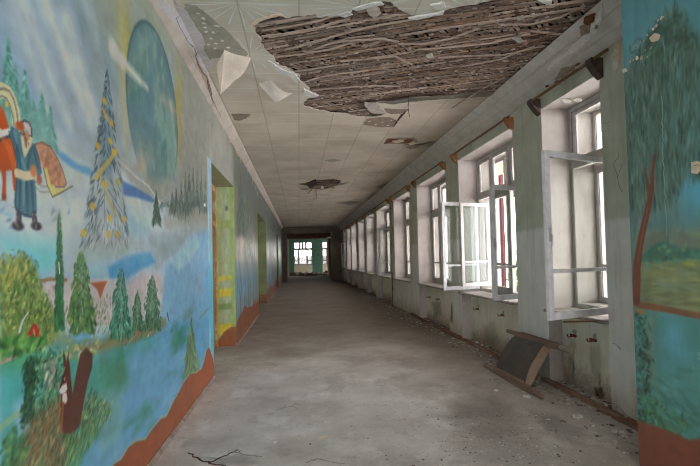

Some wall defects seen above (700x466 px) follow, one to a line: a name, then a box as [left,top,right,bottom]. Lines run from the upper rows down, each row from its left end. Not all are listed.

crack [176,18,221,116]
peeling [155,0,248,75]
spalling [545,3,603,87]
peeling [612,16,664,73]
peeling [364,102,407,127]
peeling [691,161,700,174]
crack [188,449,262,466]